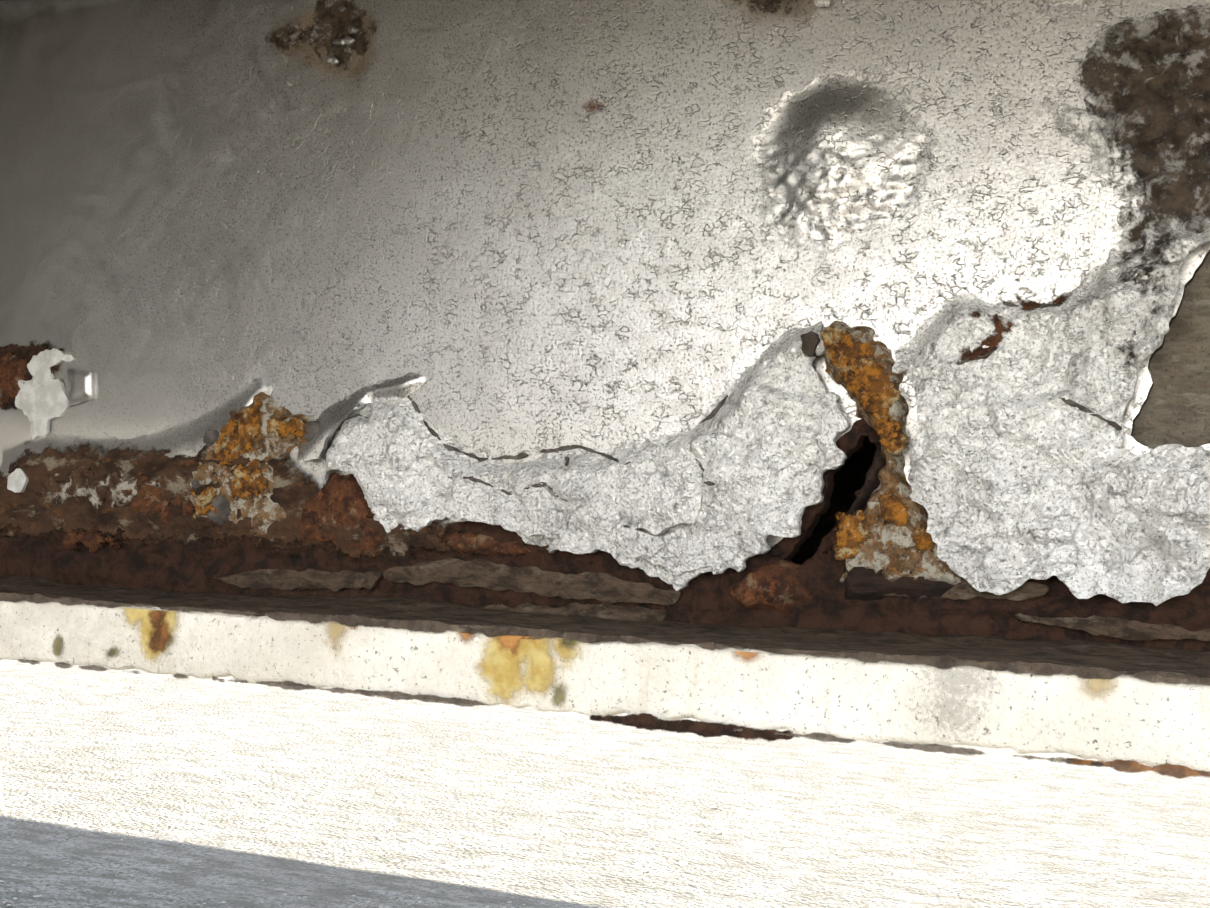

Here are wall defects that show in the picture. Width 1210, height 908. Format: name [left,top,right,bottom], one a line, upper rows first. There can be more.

crack [407,395,630,501]
peeling [318,321,849,591]
corrosion [0,320,1210,707]
crack [696,459,715,486]
crack [699,395,728,424]
peeling [892,211,1210,606]